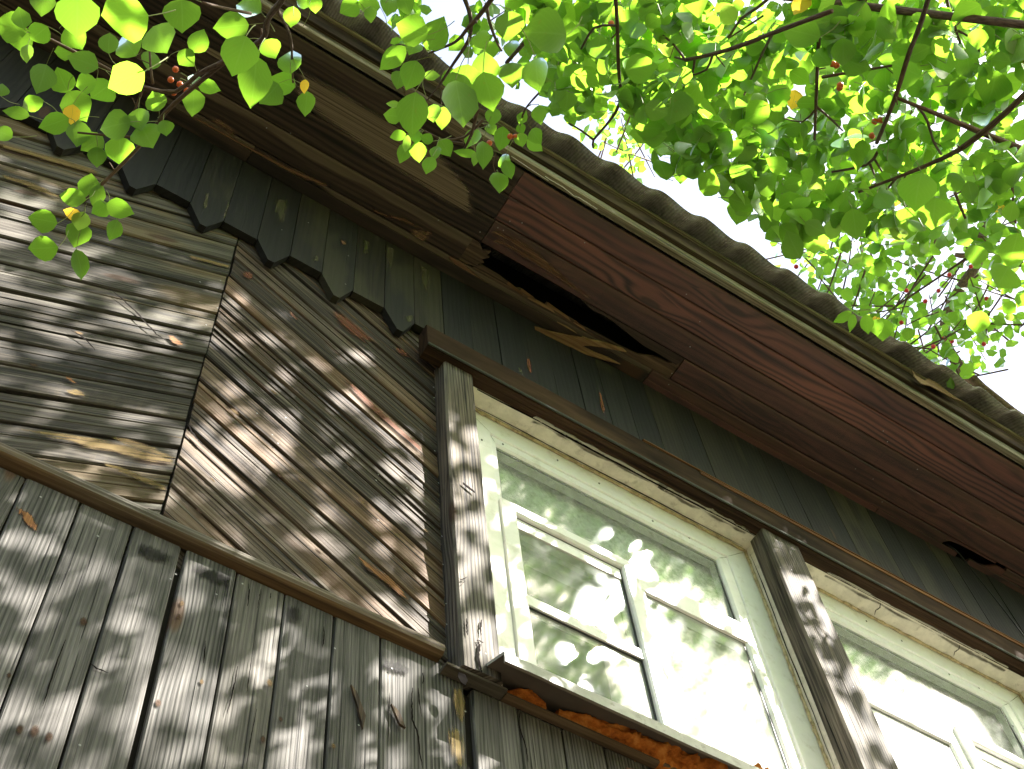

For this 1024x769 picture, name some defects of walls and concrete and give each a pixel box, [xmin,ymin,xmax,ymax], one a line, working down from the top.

peeling [828,573,1008,668]